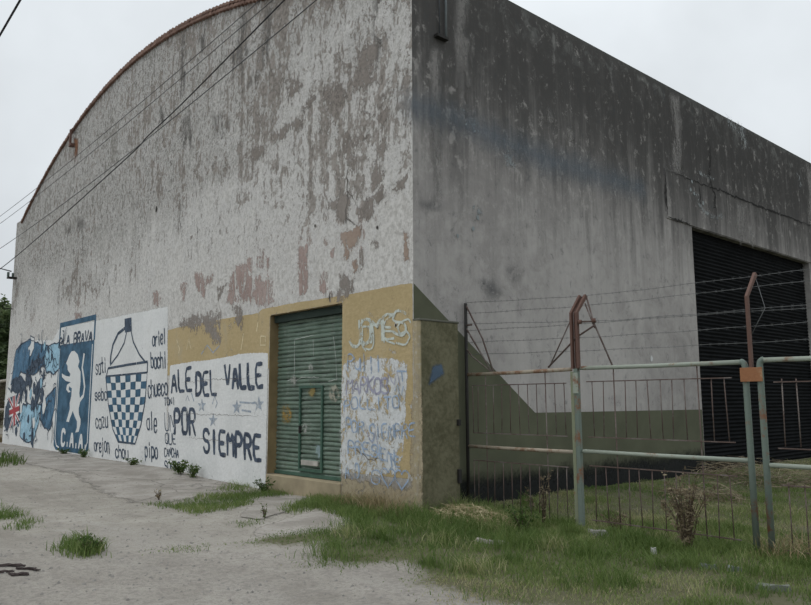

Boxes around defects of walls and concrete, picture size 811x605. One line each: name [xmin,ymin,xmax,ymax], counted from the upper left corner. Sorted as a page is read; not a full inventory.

flaking render [271,38,381,144]
flaking render [342,130,369,171]
flaking render [319,138,408,302]
leakage [671,97,681,171]
crack [665,136,810,226]
peeling [179,256,274,344]
peeling [297,242,308,296]